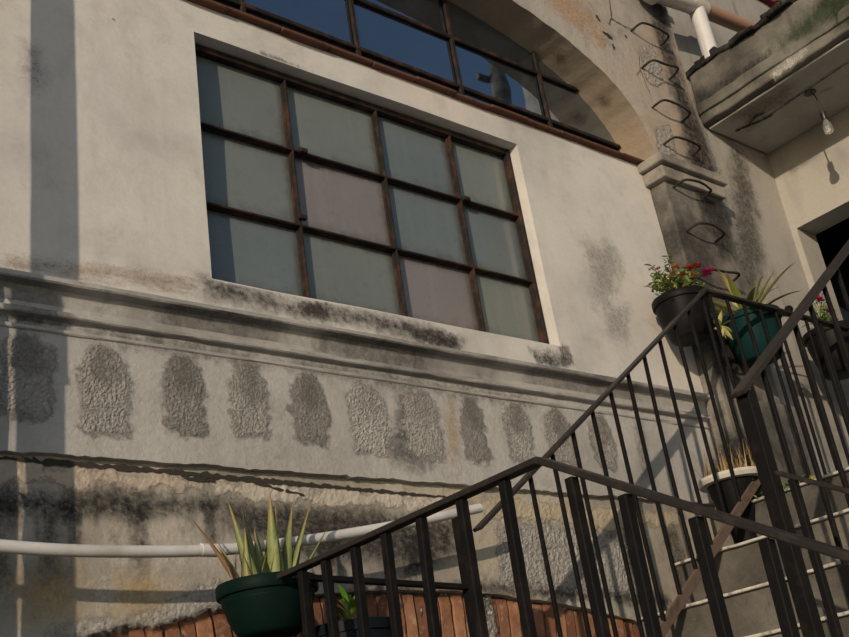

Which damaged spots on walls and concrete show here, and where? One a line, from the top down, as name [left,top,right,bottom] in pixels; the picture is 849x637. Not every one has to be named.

water stain [652,3,770,171]
water stain [699,144,763,297]
water stain [205,281,458,347]
peeling [0,455,443,512]
water stain [0,489,215,540]
water stain [228,503,398,538]
water stain [301,538,355,564]
water stain [392,527,420,573]
water stain [428,521,455,558]